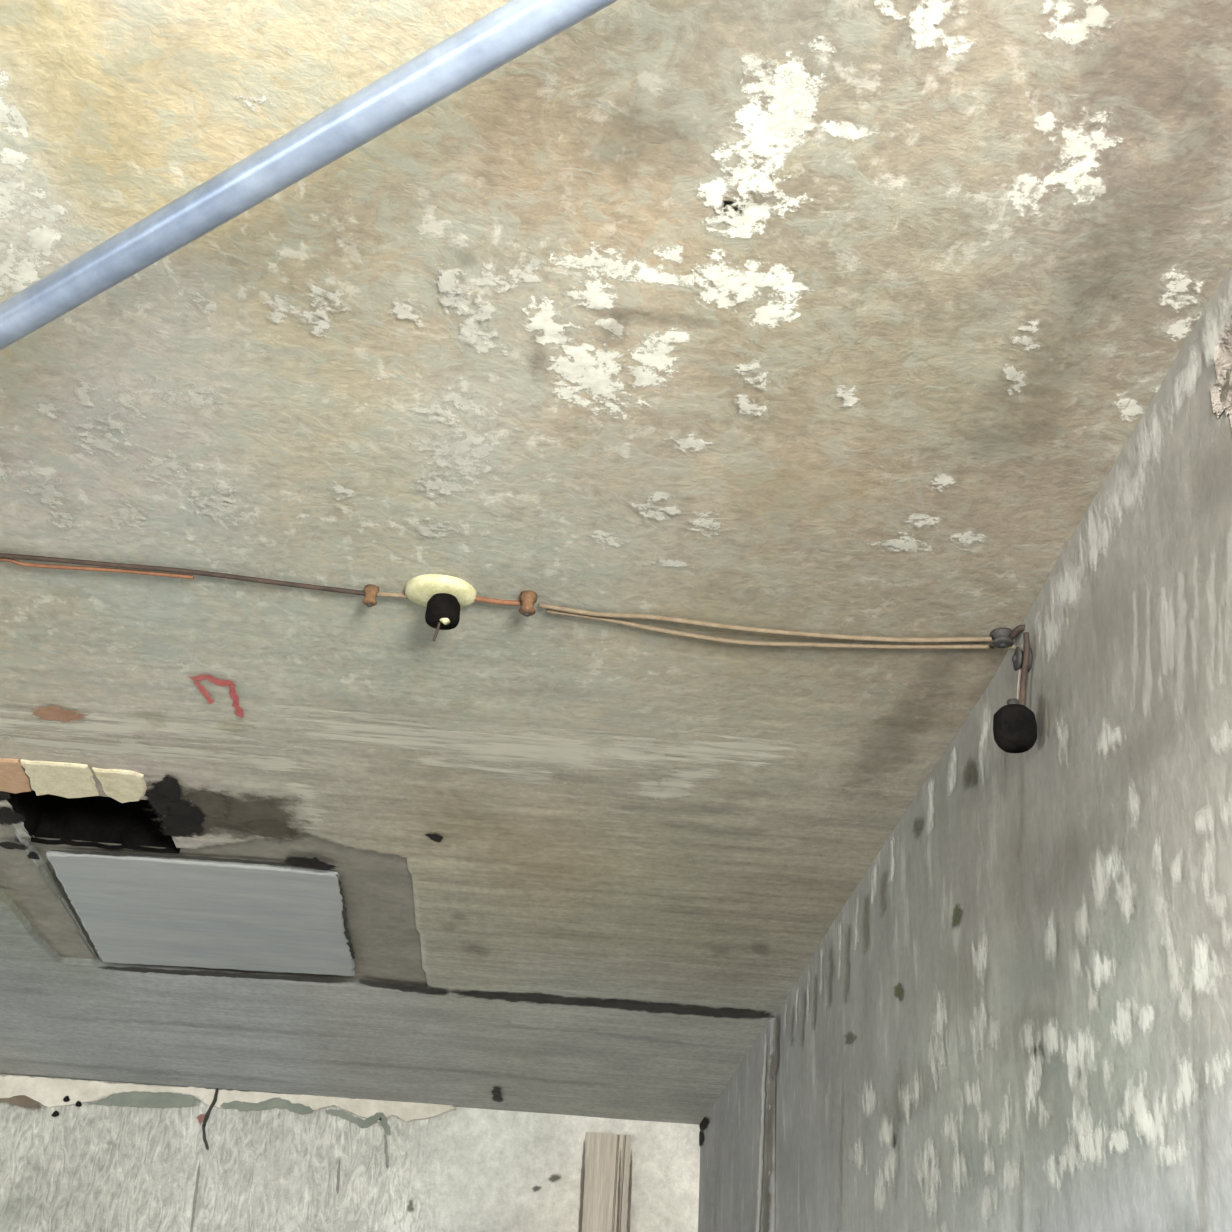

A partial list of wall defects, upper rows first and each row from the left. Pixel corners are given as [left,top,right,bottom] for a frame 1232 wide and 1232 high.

peeling [0,71,72,295]
peeling [437,36,877,420]
peeling [1007,108,1122,217]
peeling [263,283,348,337]
peeling [410,380,504,503]
peeling [1013,320,1040,351]
peeling [1114,394,1160,454]
peeling [1160,269,1203,341]
spalling [1176,316,1232,430]
leakage [963,762,976,786]
spalling [0,824,427,986]
leakage [790,873,886,1044]